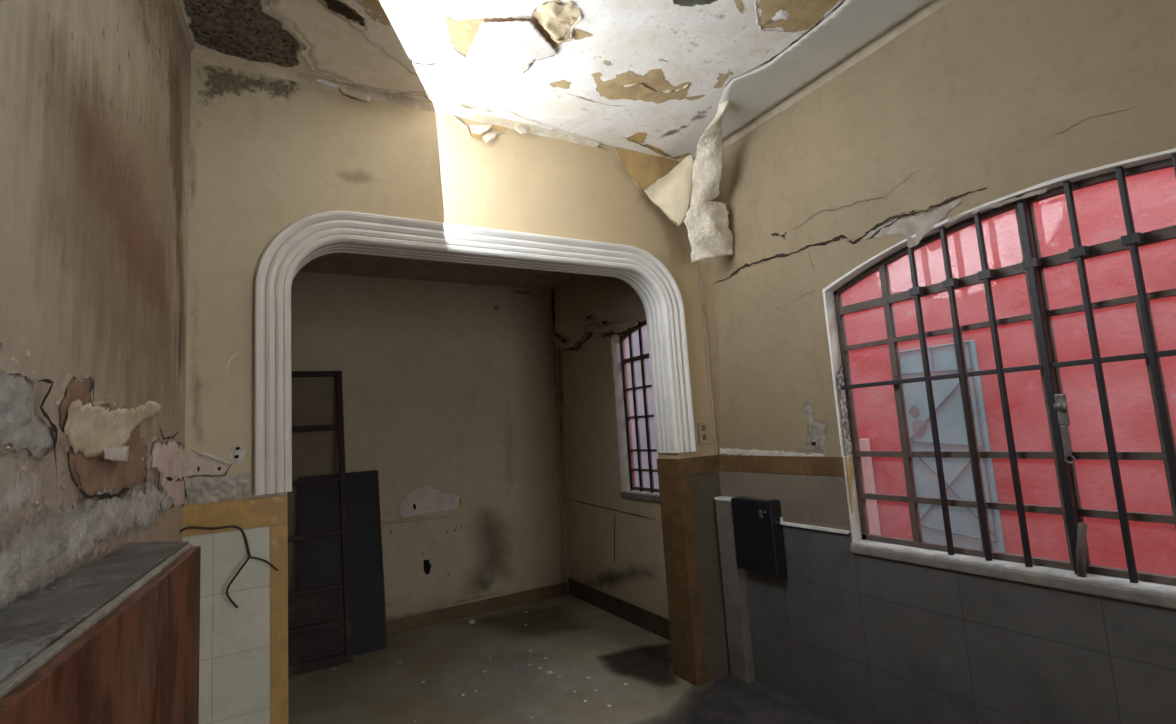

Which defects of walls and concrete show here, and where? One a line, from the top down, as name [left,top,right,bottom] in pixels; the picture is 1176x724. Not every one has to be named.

peeling [266,0,592,143]
peeling [592,0,933,140]
peeling [599,132,697,228]
crack [713,171,986,310]
peeling [0,343,283,511]
efflorescence [0,476,172,610]
peeling [399,484,462,519]
damp [601,644,674,685]
damp [659,674,847,724]